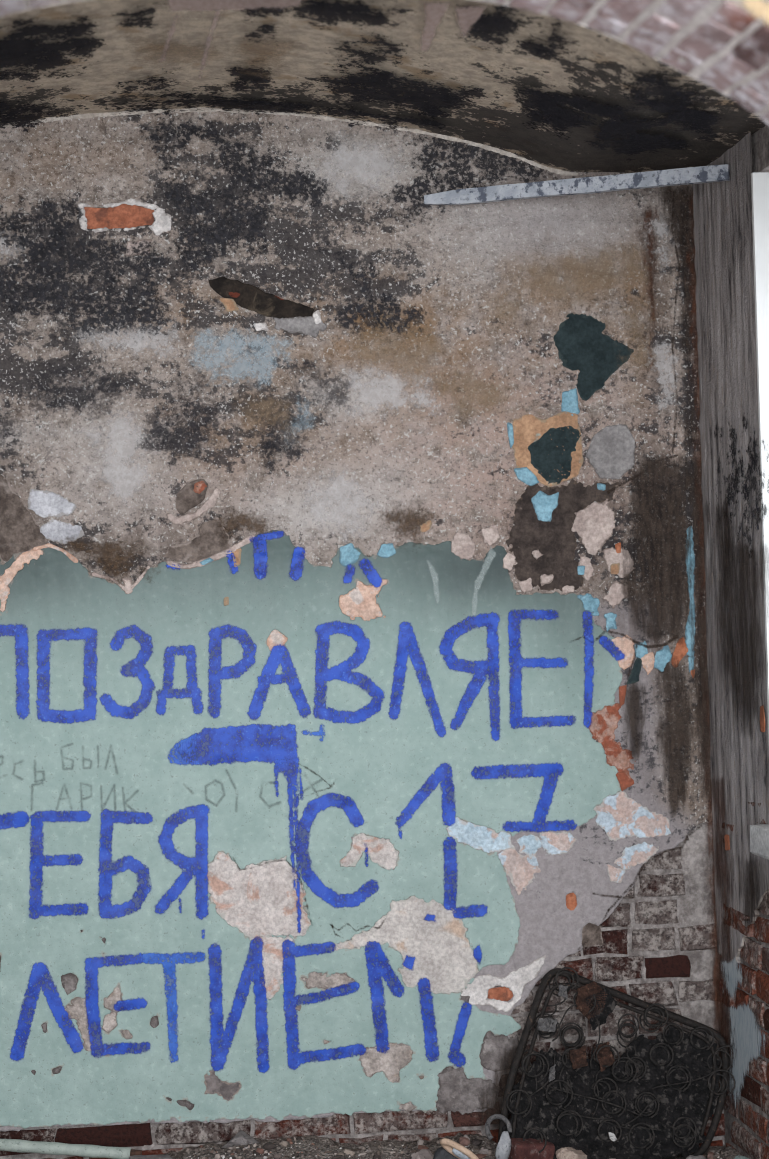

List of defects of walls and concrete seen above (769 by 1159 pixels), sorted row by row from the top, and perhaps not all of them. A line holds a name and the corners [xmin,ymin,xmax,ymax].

leakage [162,0,301,78]
leakage [421,3,486,51]
flaking render [77,199,172,256]
leakage [75,327,177,358]
leakage [651,186,694,409]
leakage [86,414,148,497]
flaking render [0,474,78,612]
flaking render [451,313,696,883]
leakage [623,416,769,813]
peeling [446,817,577,895]
peeling [207,852,311,999]
peeling [334,896,546,1013]